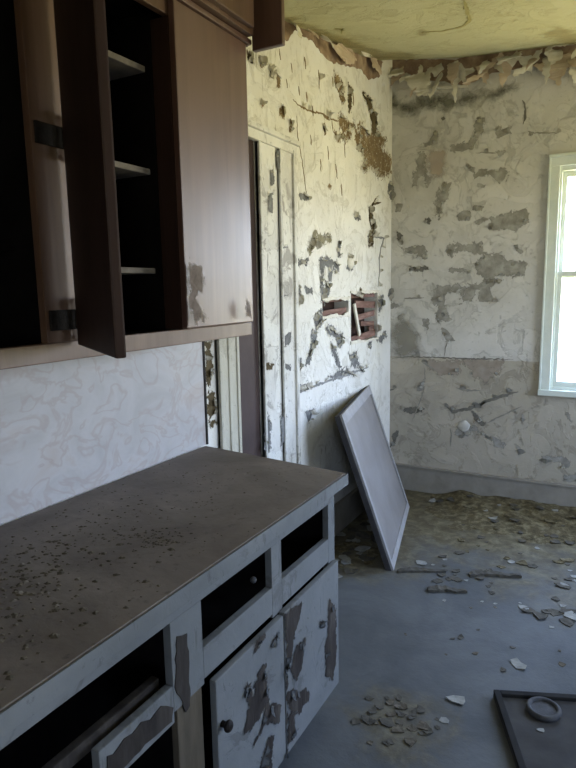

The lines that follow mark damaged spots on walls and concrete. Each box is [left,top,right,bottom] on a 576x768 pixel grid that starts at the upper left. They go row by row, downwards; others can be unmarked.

peeling [247,49,293,88]
peeling [279,106,295,133]
crack [293,99,341,193]
peeling [318,69,403,212]
peeling [268,150,279,213]
peeling [354,207,377,248]
peeling [397,231,429,272]
peeling [456,206,529,232]
spalling [285,230,404,392]
peeling [399,241,527,421]
peeling [204,340,219,428]
crack [445,385,522,446]